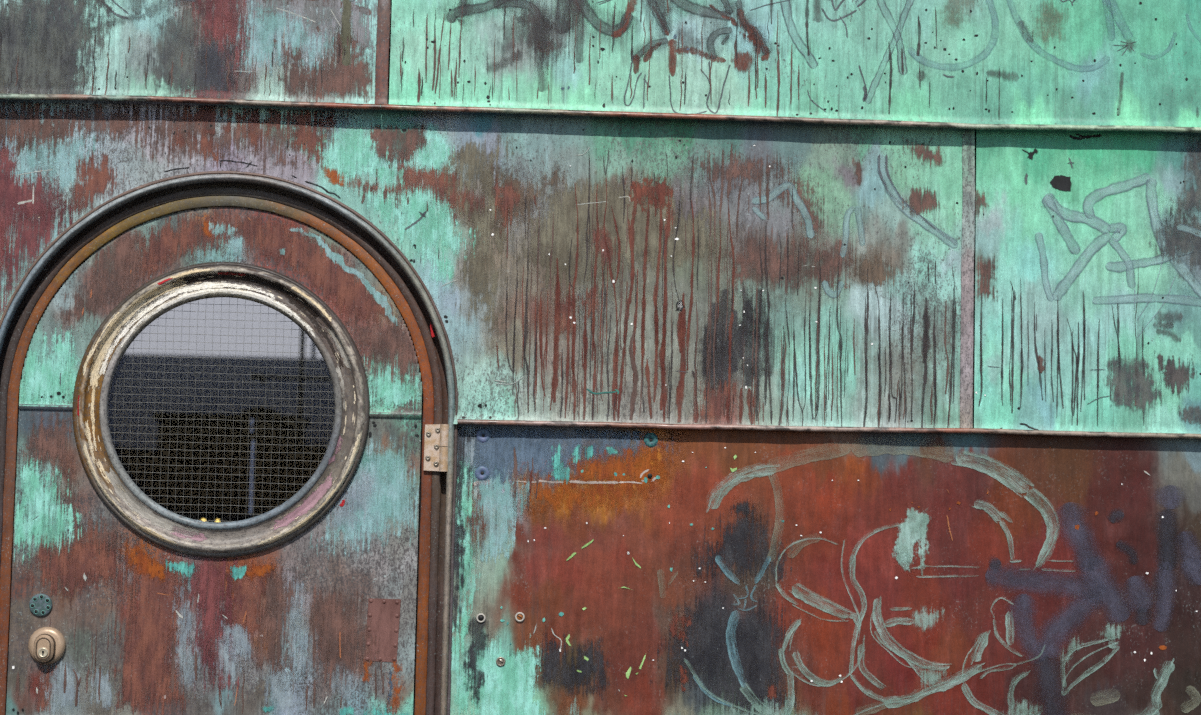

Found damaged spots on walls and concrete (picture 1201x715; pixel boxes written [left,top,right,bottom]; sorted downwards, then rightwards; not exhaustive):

corrosion [175,0,256,99]
corrosion [324,166,344,186]
corrosion [625,178,673,237]
corrosion [516,441,667,516]
corrosion [467,484,492,556]
corrosion [125,540,166,580]
corrosion [178,556,274,696]
corrosion [391,661,402,708]